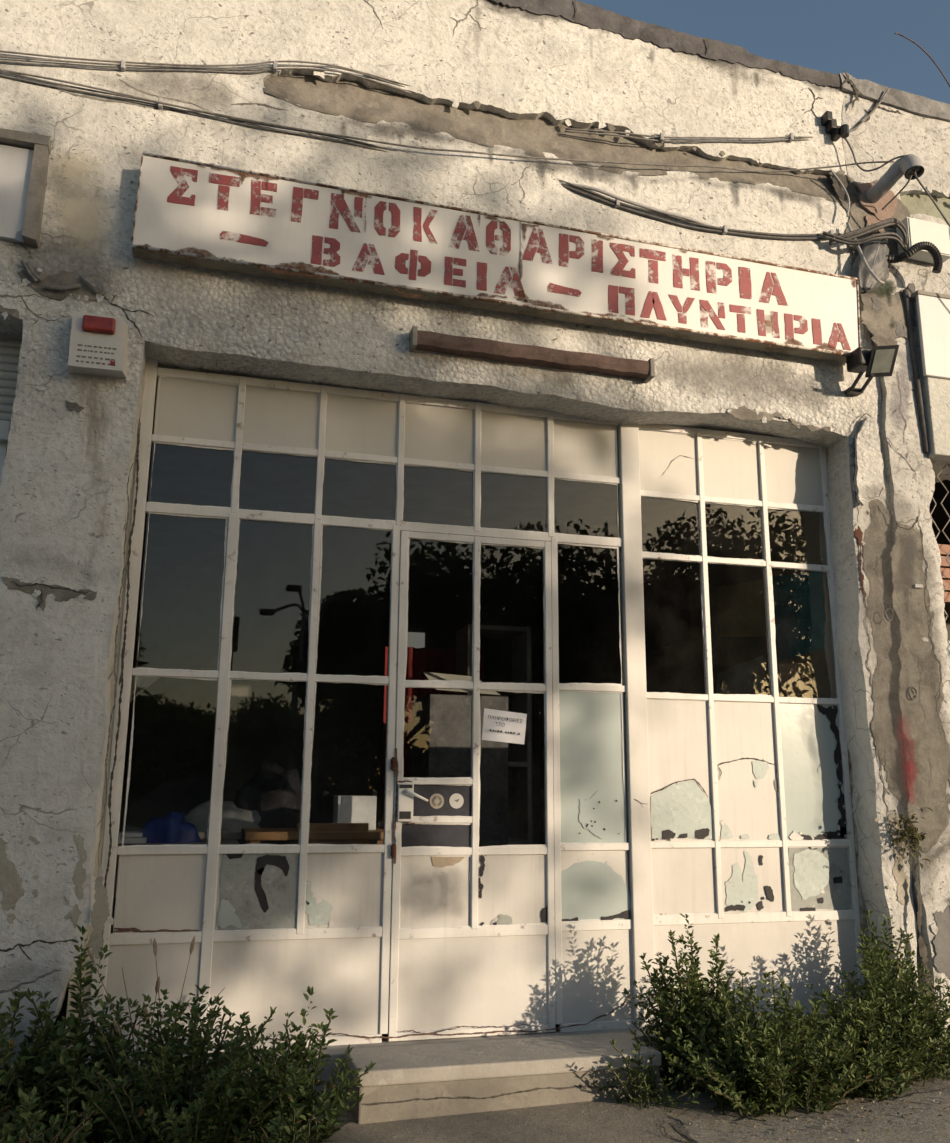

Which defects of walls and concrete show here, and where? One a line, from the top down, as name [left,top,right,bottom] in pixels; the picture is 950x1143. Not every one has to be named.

crack [450,0,481,36]
spalling [263,68,950,346]
spalling [17,260,105,302]
spalling [2,577,97,611]
crack [11,581,90,610]
crack [97,422,141,888]
crack [852,372,945,738]
peeling [853,499,950,905]
crack [858,548,934,996]
peeling [0,833,40,929]
peeling [57,830,114,959]
crack [0,929,104,999]